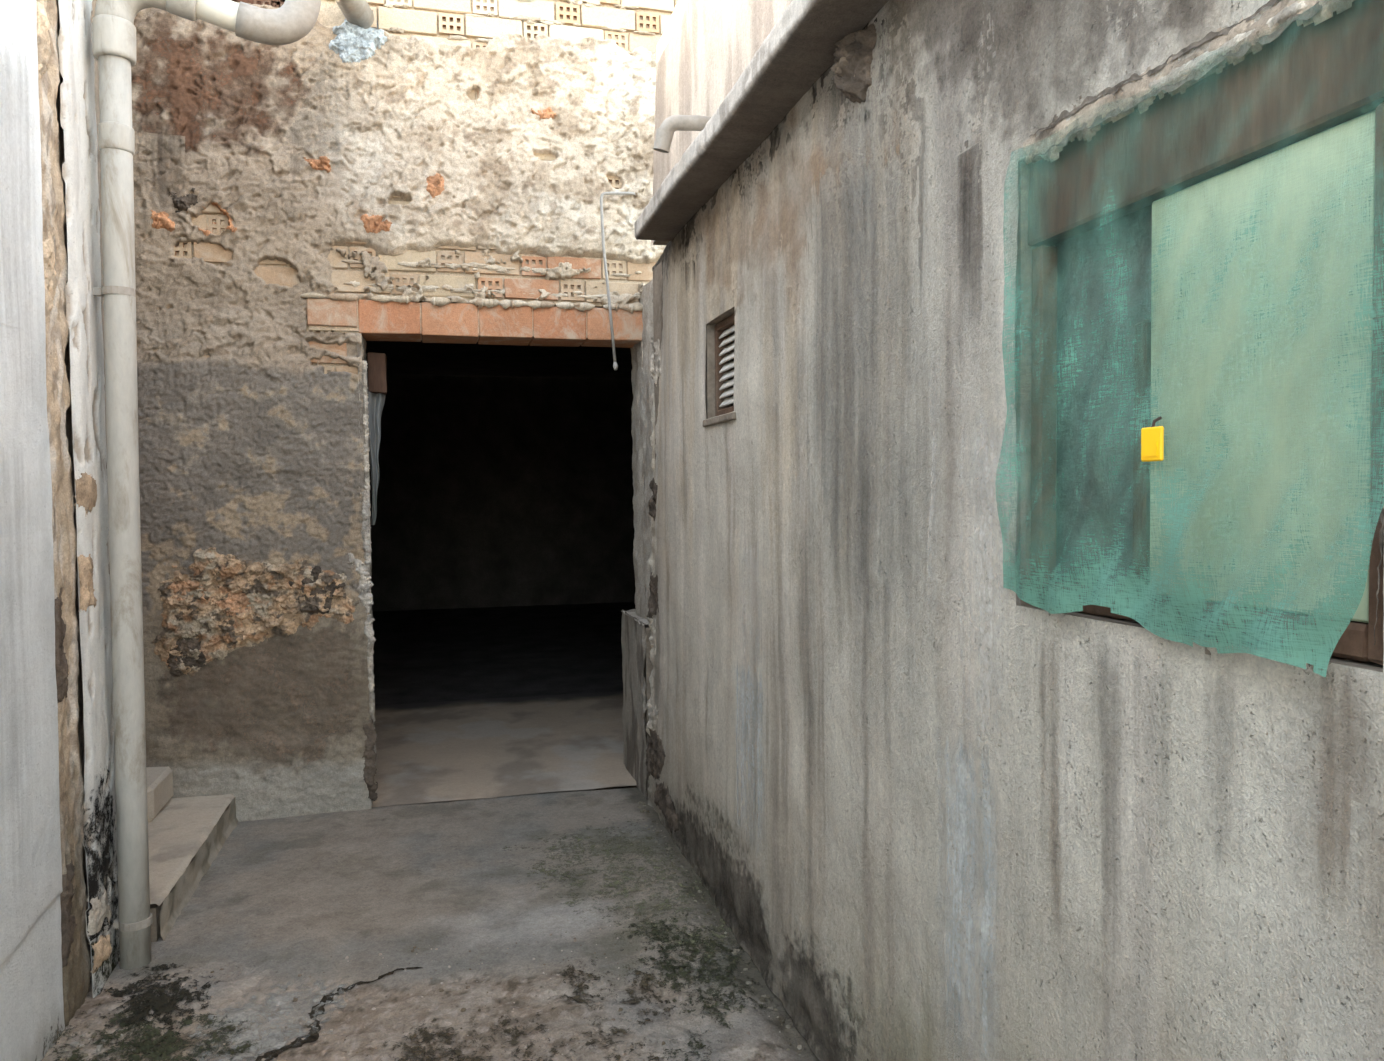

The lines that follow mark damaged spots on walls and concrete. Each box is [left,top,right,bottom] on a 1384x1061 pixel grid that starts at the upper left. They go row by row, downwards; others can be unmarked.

flaking render [531,107,557,119]
flaking render [1023,0,1355,165]
flaking render [303,156,331,173]
flaking render [360,214,392,233]
flaking render [426,173,449,198]
flaking render [151,361,378,801]
damp [83,769,120,995]
damp [665,796,868,1061]
crack [255,967,422,1061]